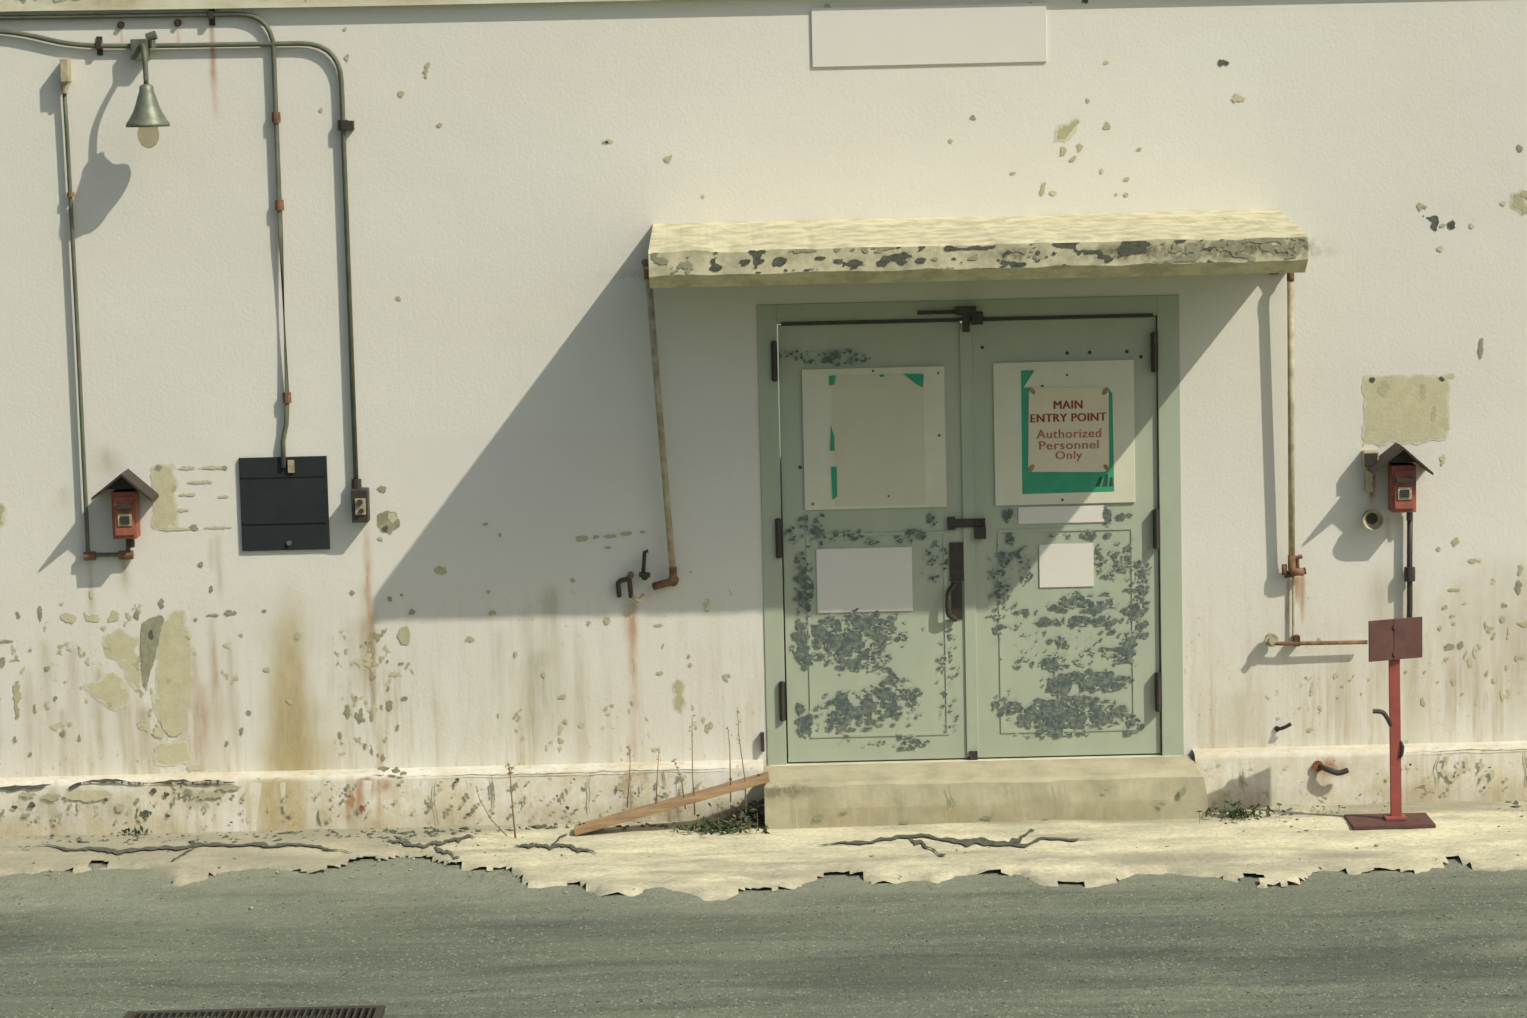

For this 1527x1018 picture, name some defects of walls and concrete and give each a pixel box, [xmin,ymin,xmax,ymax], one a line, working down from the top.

spalling [1053,118,1083,161]
spalling [652,237,1306,275]
spalling [1417,202,1475,252]
spalling [1500,189,1527,216]
peeling [779,349,870,366]
peeling [1361,373,1455,465]
peeling [150,464,232,532]
peeling [785,513,960,750]
peeling [988,506,1152,738]
peeling [0,590,246,827]
spalling [335,593,701,821]
peeling [314,781,372,823]